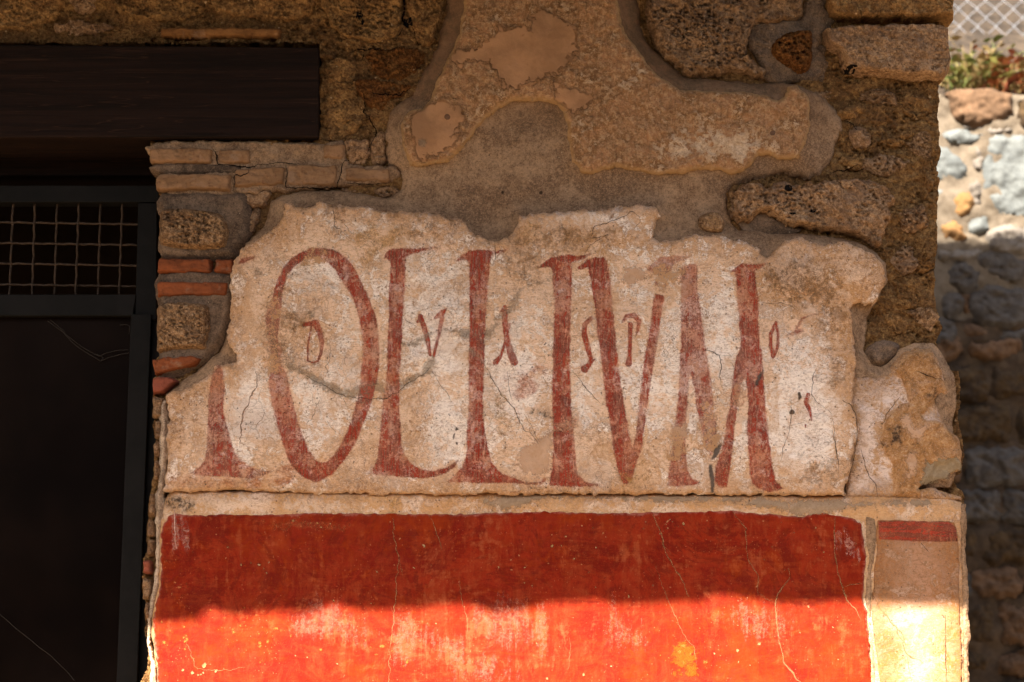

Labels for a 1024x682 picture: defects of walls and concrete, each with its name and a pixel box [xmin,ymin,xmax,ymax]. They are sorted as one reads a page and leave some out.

crack [239,374,265,443]
spalling [919,457,962,485]
crack [653,515,697,663]
crack [733,512,800,682]